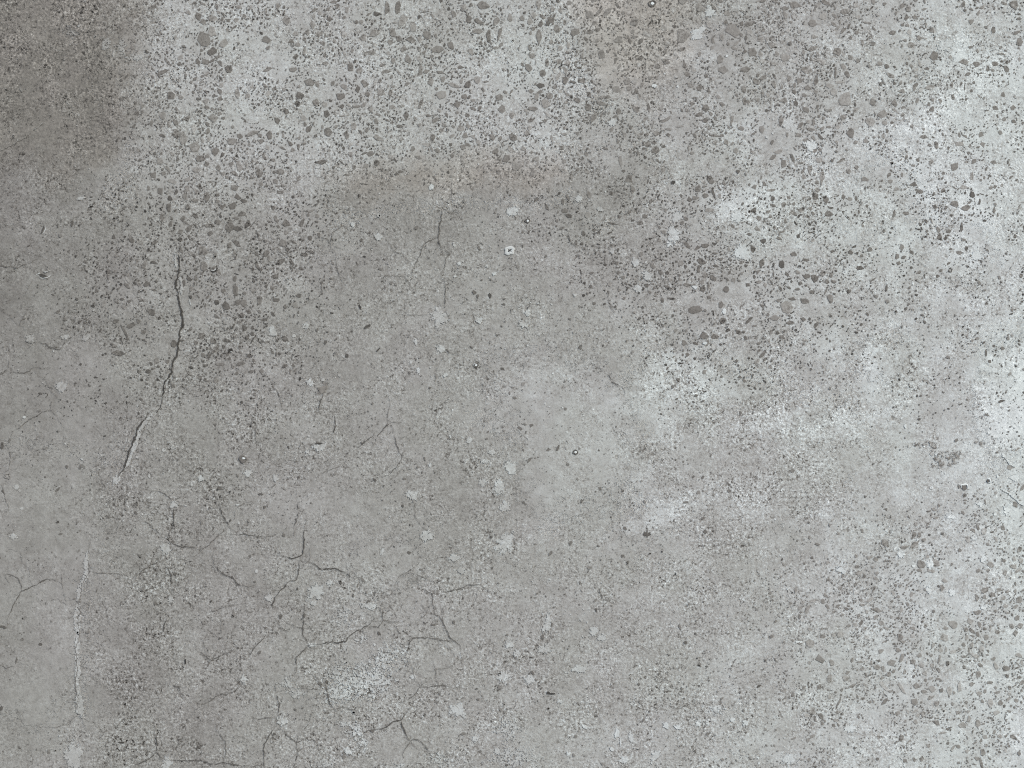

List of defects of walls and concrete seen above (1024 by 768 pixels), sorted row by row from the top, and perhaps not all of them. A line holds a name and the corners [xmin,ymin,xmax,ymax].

crack [113,225,184,484]
crack [5,463,494,768]